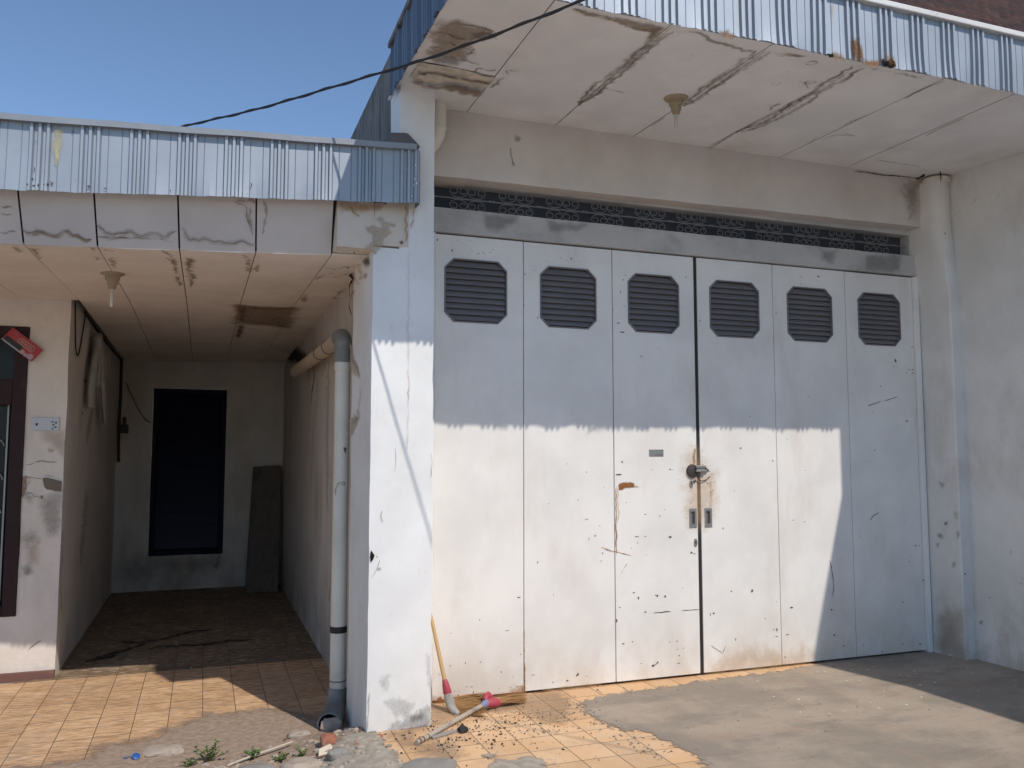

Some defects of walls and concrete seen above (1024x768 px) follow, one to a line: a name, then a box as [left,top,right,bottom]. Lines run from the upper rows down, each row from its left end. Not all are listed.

damp [429,22,492,63]
damp [558,11,668,124]
corrosion [825,39,896,68]
damp [709,81,821,149]
damp [236,305,292,338]
spalling [43,478,62,492]